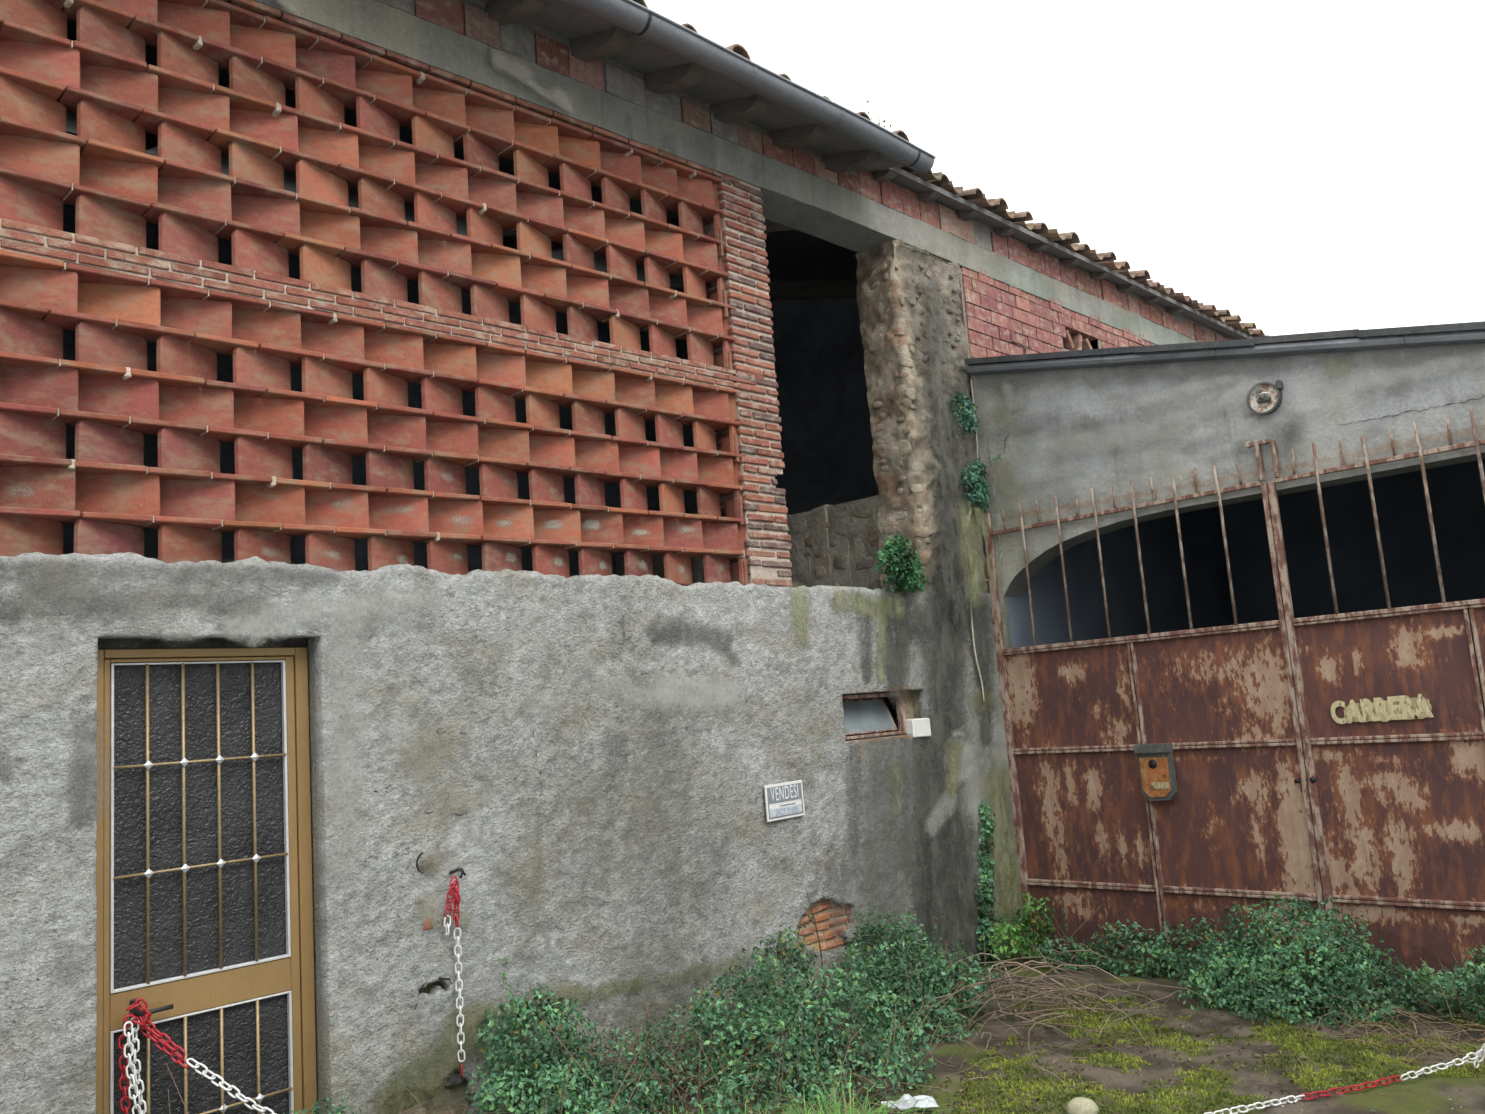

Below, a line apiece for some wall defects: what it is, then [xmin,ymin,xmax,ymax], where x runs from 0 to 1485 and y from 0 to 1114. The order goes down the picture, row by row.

spalling [797,899,851,952]
damp [862,277,993,978]